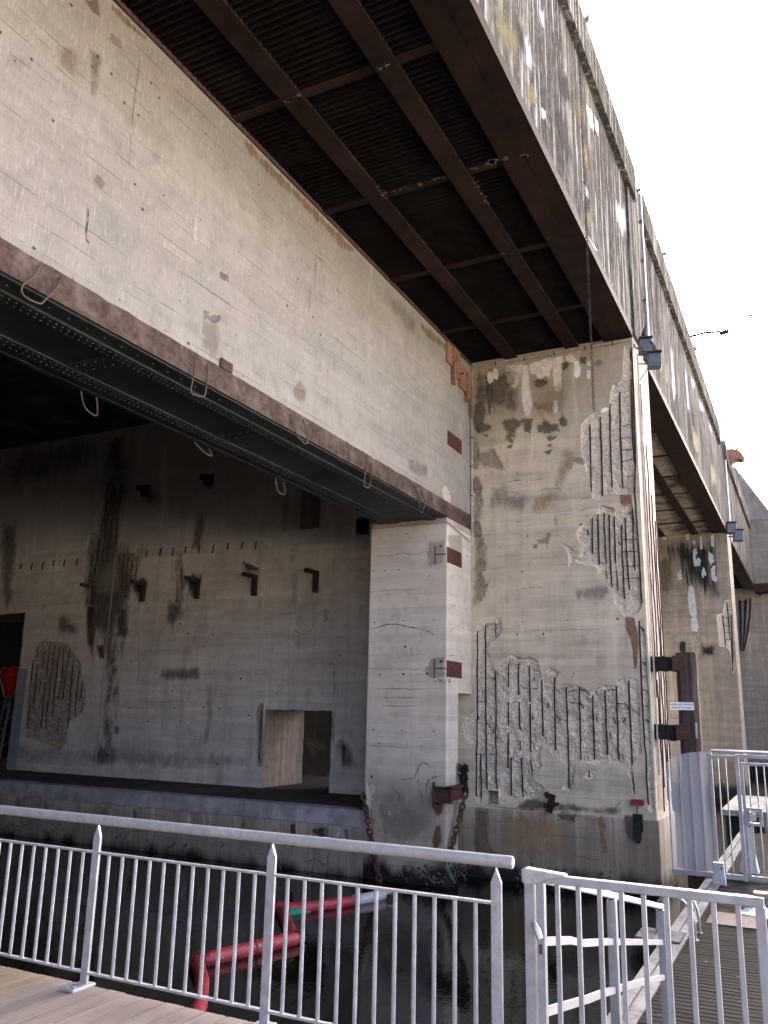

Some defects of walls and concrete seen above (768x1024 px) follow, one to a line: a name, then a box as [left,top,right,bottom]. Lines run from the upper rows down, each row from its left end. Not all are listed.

leakage [473,354,591,603]
spalling [25,640,86,751]
leakage [87,486,129,635]
spalling [461,346,673,813]
corrosion [625,617,638,668]
leakage [663,533,719,632]
spalling [716,599,734,673]